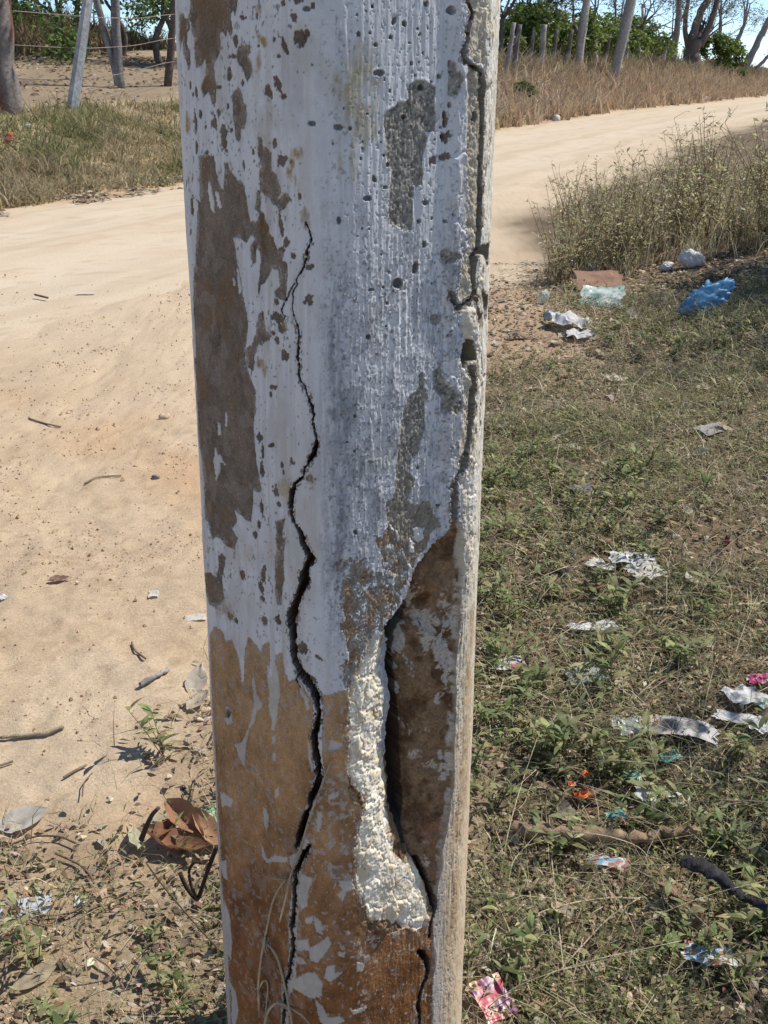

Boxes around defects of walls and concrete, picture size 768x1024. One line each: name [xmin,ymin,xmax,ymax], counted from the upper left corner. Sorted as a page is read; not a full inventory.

crack [465,3,474,35]
crack [468,65,482,137]
spalling [179,0,485,1024]
crack [281,221,324,1024]
crack [411,854,437,1024]